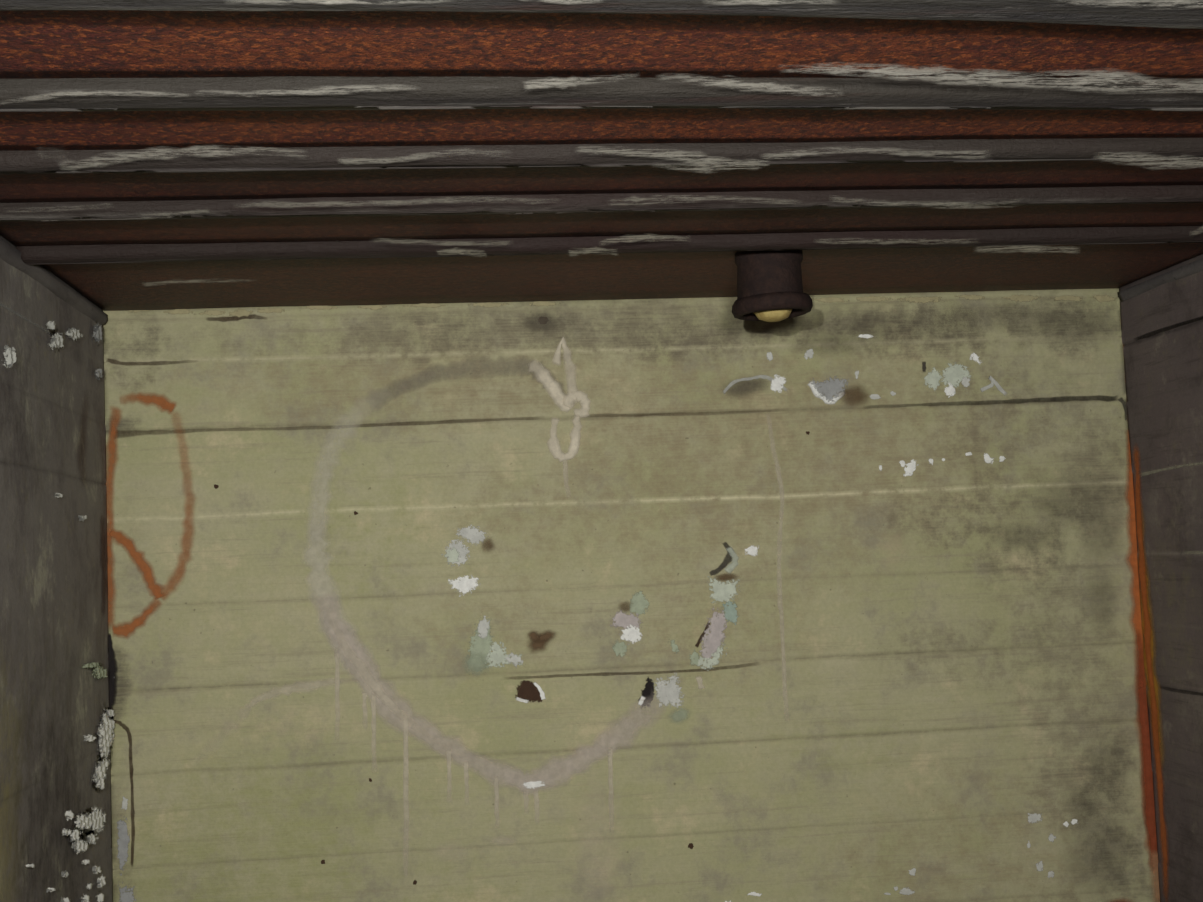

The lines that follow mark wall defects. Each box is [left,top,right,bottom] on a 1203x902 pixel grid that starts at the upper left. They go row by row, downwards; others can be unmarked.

peeling [808,371,896,404]
peeling [922,353,1007,398]
peeling [441,524,492,597]
peeling [82,662,108,679]
peeling [466,616,554,703]
peeling [610,591,649,657]
spalling [638,673,687,721]
peeling [671,543,759,688]
corrosion [1127,442,1168,902]
peeling [83,709,115,789]
peeling [46,796,136,902]